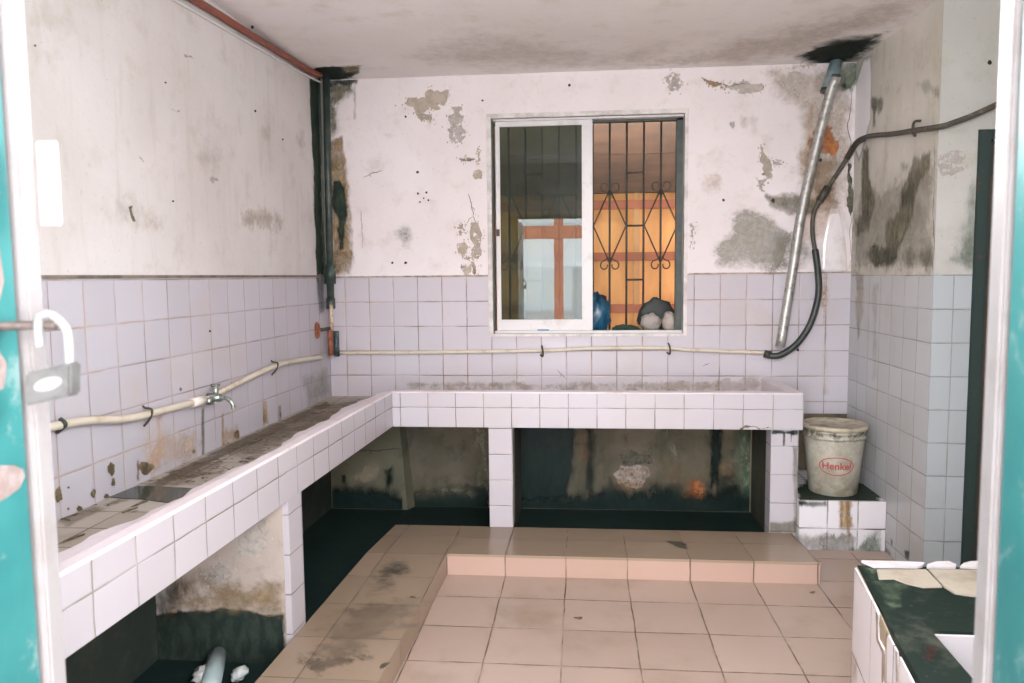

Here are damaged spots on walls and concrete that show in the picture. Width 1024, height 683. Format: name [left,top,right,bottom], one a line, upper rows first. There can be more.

peeling [662,69,688,95]
flaking render [702,38,873,96]
peeling [395,85,483,180]
peeling [454,214,485,280]
leakage [717,210,791,268]
corrosion [809,125,839,199]
leakage [857,148,875,233]
leakage [869,155,930,266]
leakage [332,427,489,509]
peeling [613,450,653,489]
leakage [521,428,751,512]
corrosion [841,501,852,536]